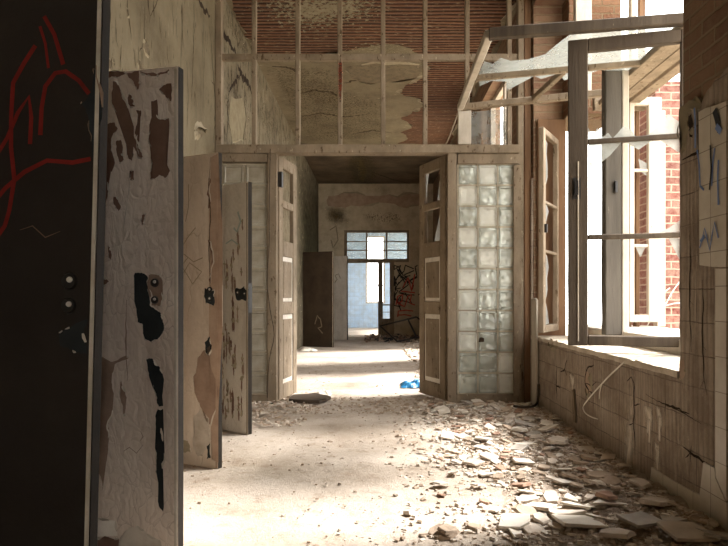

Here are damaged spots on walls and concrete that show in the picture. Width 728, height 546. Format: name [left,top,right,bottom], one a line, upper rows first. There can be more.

flaking render [345,62,429,85]
flaking render [327,191,419,208]
crack [627,377,701,442]
crack [683,447,710,465]